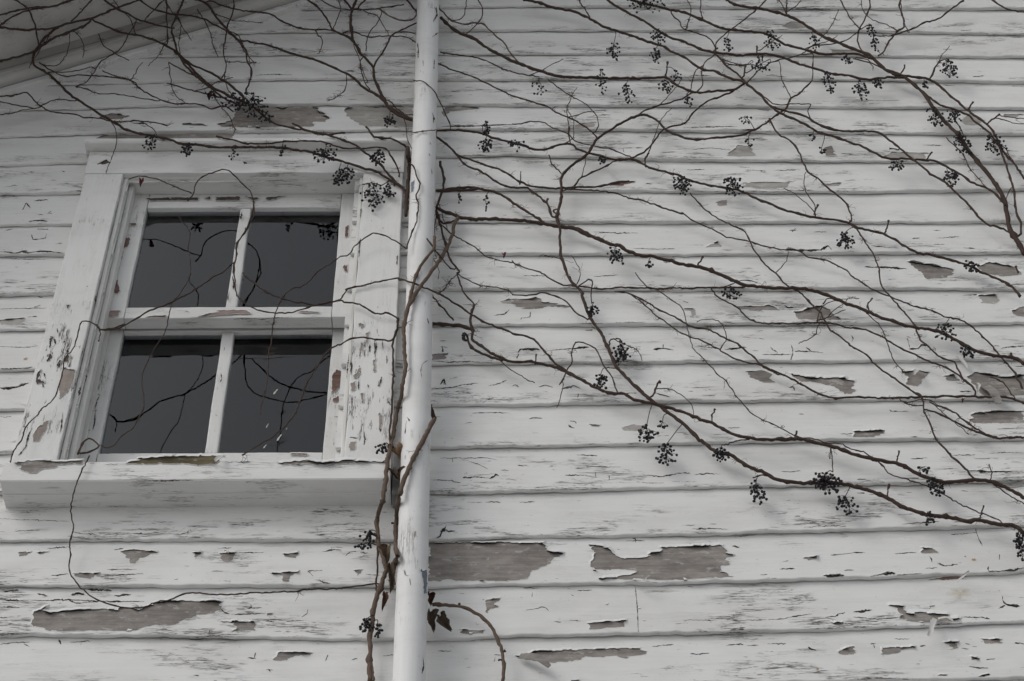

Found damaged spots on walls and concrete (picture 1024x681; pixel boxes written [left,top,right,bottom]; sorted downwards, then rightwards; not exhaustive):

peeling [96,103,332,139]
peeling [905,259,955,280]
peeling [331,358,376,403]
peeling [787,371,858,394]
peeling [899,355,1024,424]
peeling [14,458,84,473]
peeling [126,453,226,466]
peeling [420,539,565,595]
peeling [588,542,736,581]
peeling [31,598,275,632]
peeling [886,602,981,661]
peeling [514,646,647,668]